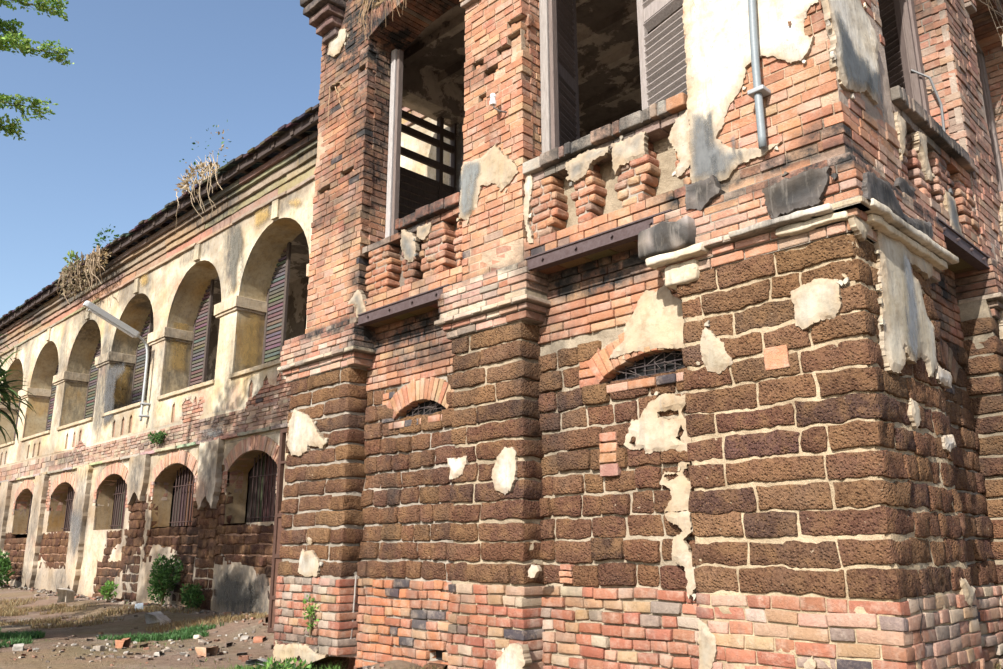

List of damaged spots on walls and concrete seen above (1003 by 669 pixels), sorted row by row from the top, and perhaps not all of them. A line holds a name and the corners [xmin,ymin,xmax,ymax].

peeling [682,0,879,183]
leakage [837,12,884,114]
leakage [693,113,736,175]
leakage [905,257,918,355]
peeling [624,391,697,601]
leakage [216,574,259,606]